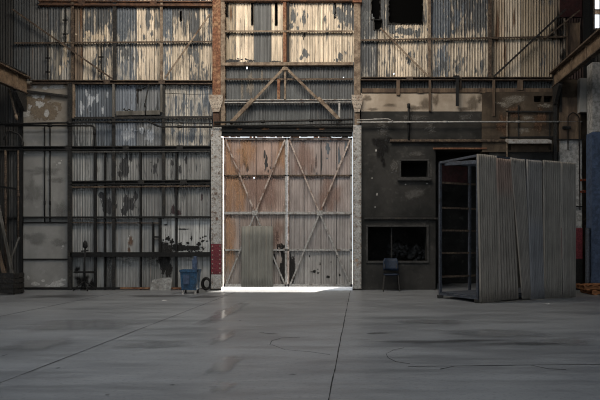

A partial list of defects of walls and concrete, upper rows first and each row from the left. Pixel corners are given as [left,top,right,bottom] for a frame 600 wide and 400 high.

peeling [118,0,155,64]
peeling [289,3,308,40]
peeling [324,4,352,28]
peeling [58,24,107,75]
peeling [188,45,205,71]
peeling [435,51,464,76]
peeling [79,89,109,116]
peeling [98,191,138,216]